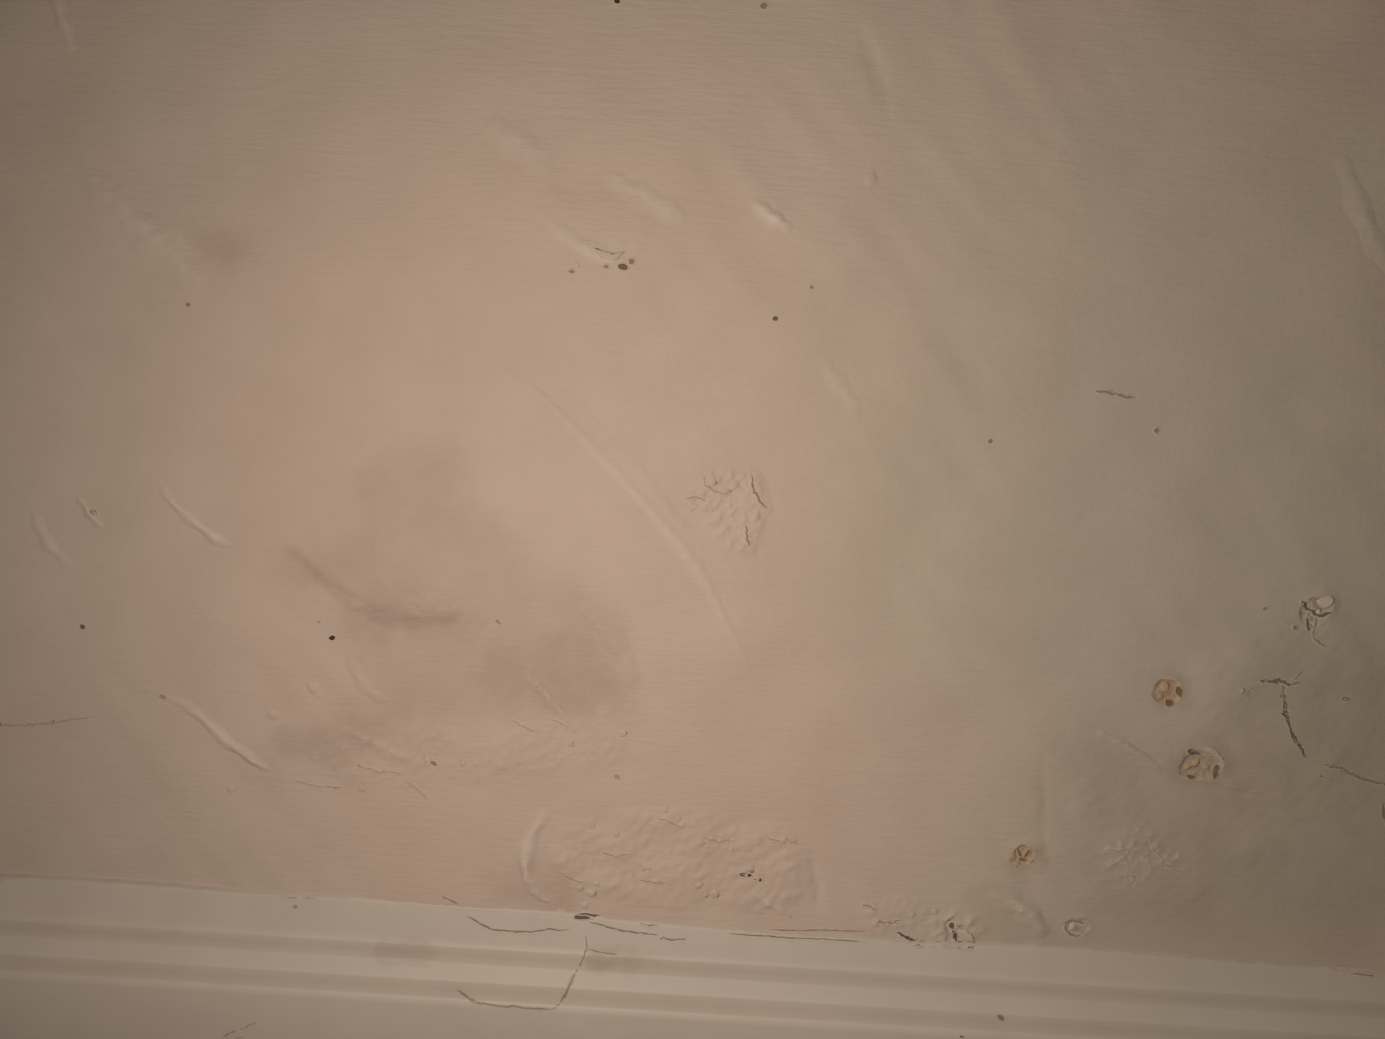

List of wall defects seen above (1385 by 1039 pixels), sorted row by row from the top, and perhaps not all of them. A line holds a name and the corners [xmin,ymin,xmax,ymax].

spalling [1290,584,1342,649]
crack [1239,671,1385,829]
crack [442,895,686,1012]